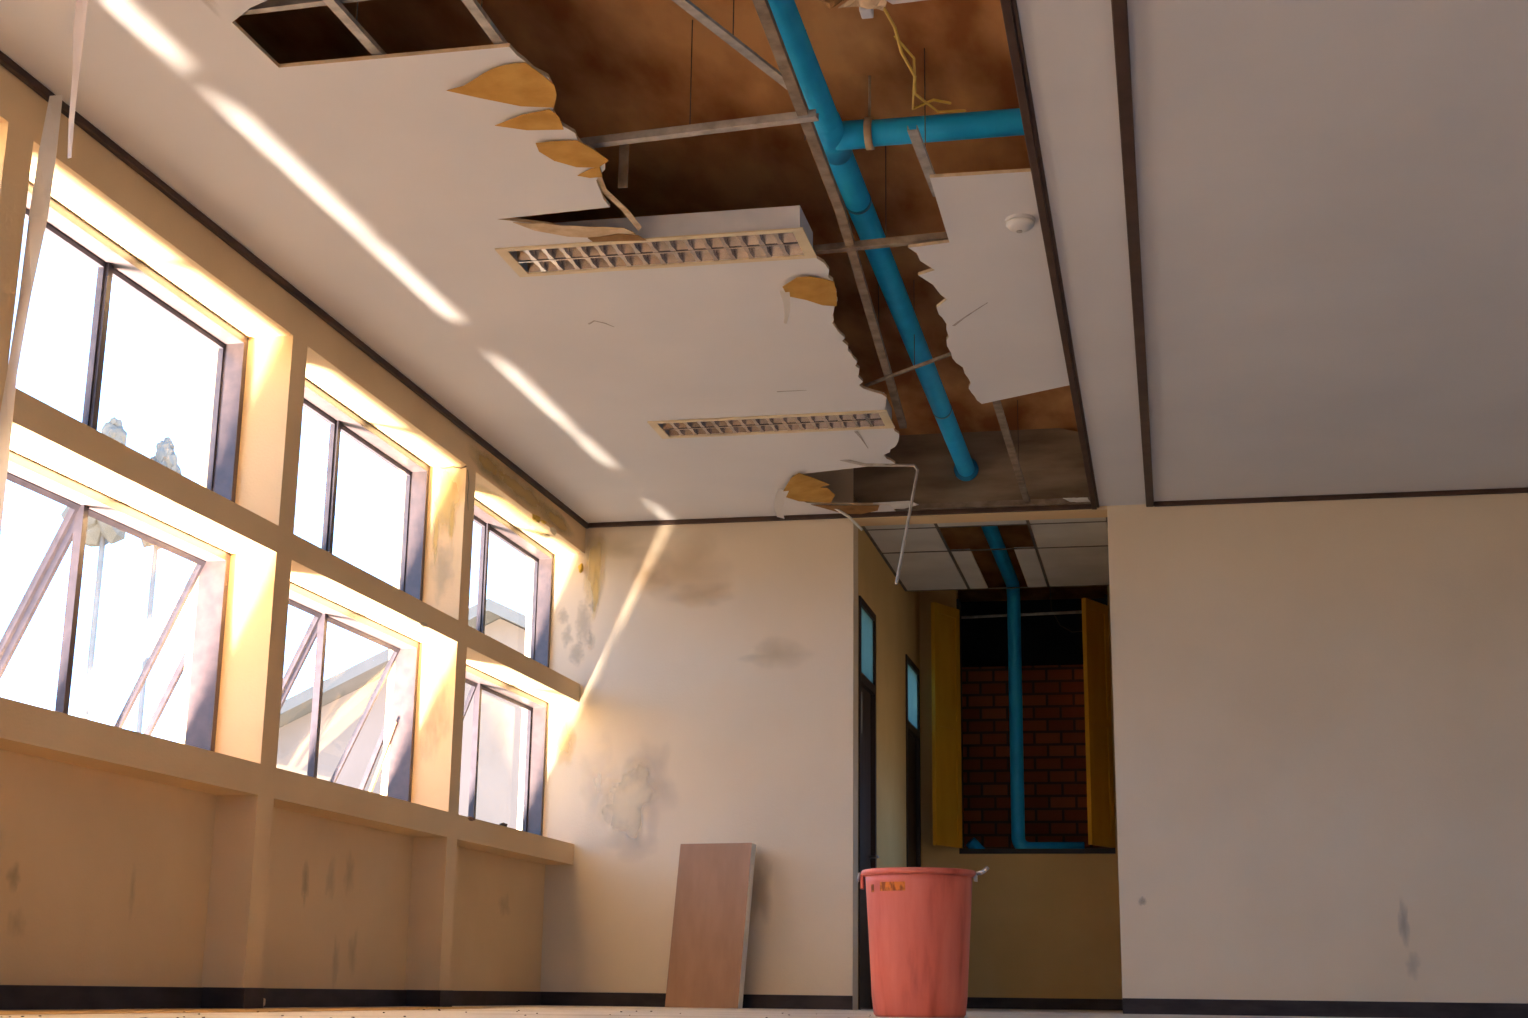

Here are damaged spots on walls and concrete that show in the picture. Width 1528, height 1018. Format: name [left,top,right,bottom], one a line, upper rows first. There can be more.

water stain [434,475,456,548]
spalling [532,514,557,538]